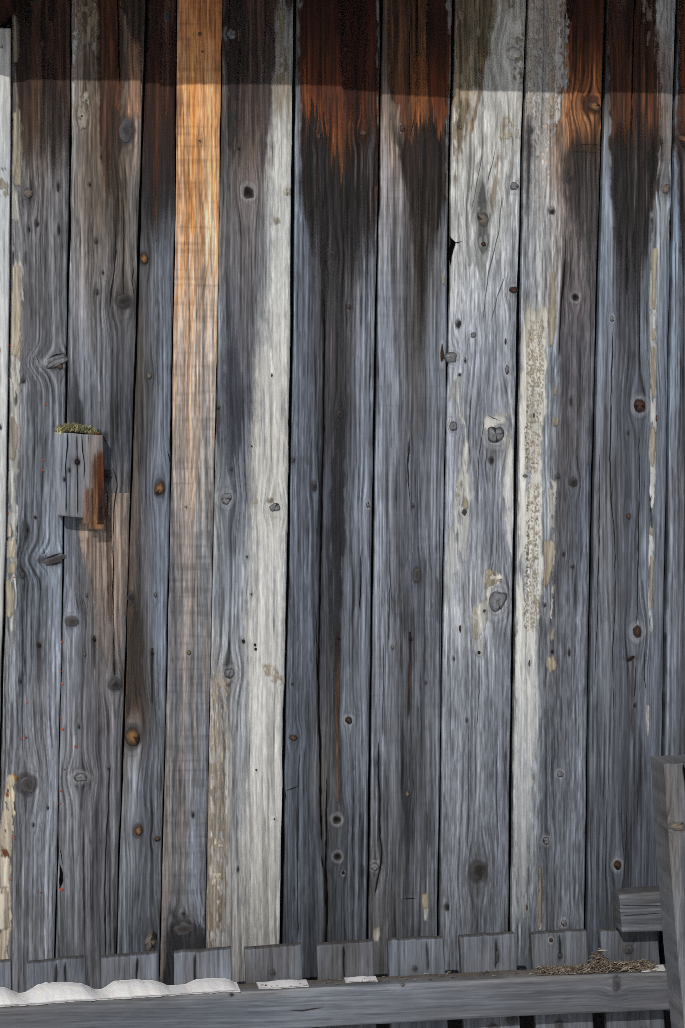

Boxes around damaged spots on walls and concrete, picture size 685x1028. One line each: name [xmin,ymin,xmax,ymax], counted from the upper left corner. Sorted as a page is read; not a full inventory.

peeling [0,109,22,221]
damp [225,0,494,316]
damp [490,156,498,211]
damp [563,0,663,285]
damp [677,0,685,262]
peeling [5,240,24,657]
peeling [471,569,503,658]
peeling [484,271,559,929]
peeling [0,774,17,959]